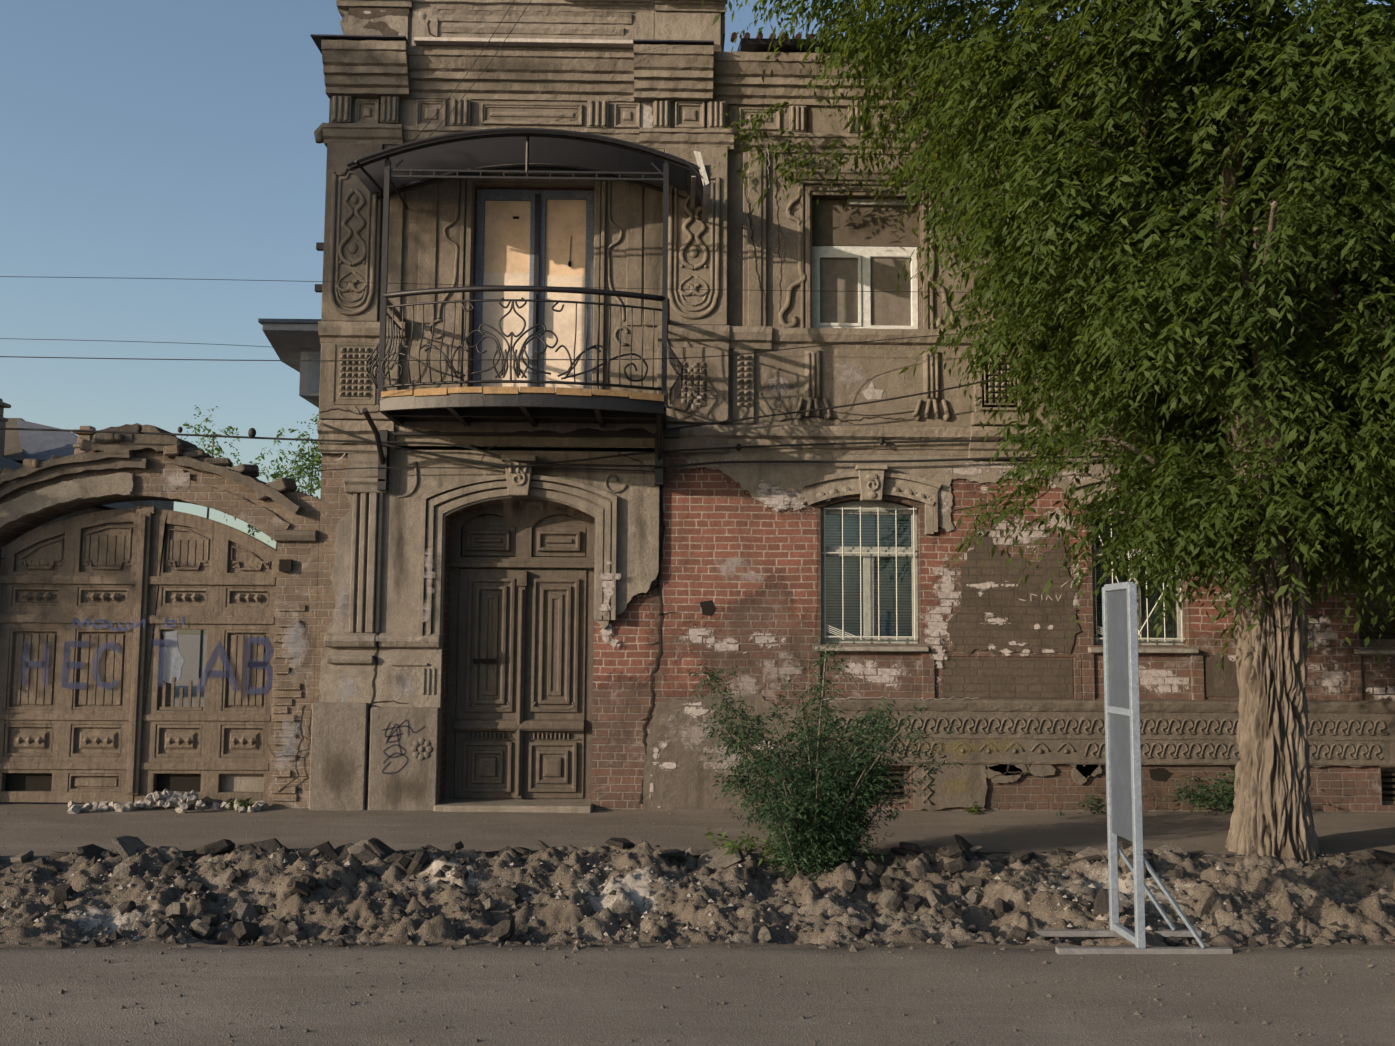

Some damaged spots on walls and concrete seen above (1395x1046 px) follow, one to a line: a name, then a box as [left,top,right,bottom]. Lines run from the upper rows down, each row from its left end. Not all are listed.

crack [367,643,407,796]
crack [618,452,678,804]
spalling [593,459,819,810]
peeling [921,479,1088,698]
spalling [985,764,1107,811]
spalling [1141,765,1235,811]